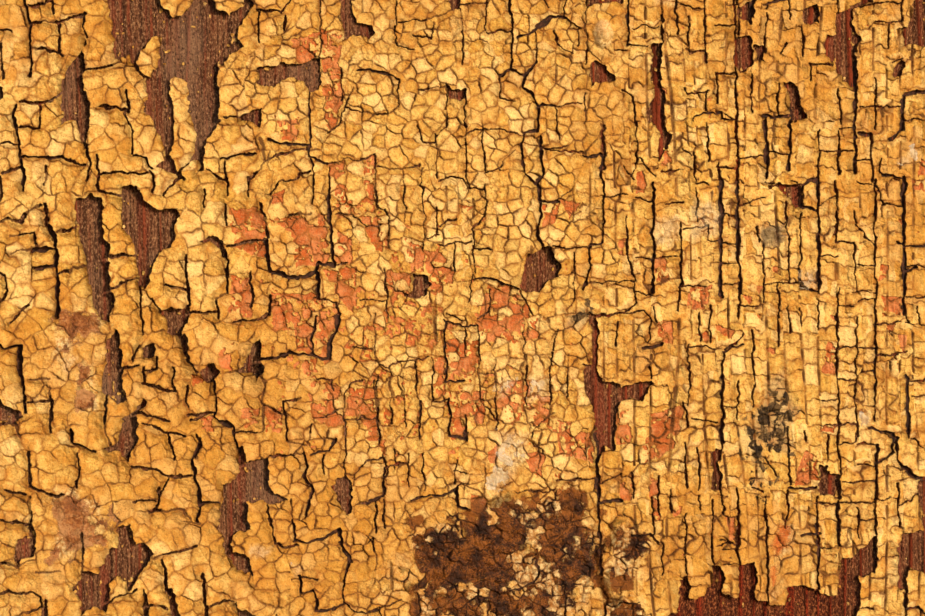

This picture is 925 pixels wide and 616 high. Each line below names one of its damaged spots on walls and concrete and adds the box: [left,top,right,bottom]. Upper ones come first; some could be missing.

peeling [44,0,389,483]
crack [220,92,341,360]
peeling [434,199,581,441]
crack [499,0,580,246]
peeling [496,298,685,468]
crack [717,180,741,296]
crack [762,104,821,292]
crack [851,61,925,534]
peeling [0,481,198,616]
peeling [199,405,300,616]
crack [292,439,382,616]
peeling [641,469,925,616]